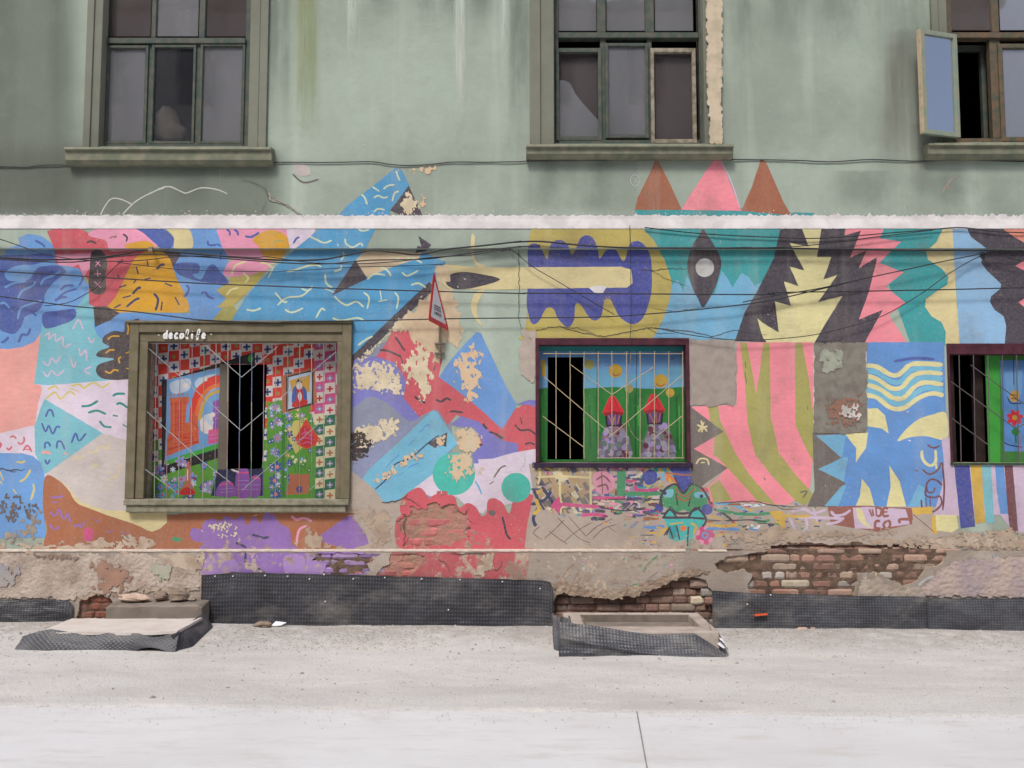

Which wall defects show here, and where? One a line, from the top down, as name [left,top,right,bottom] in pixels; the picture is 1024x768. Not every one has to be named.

peeling [706,0,723,144]
peeling [400,189,427,216]
peeling [819,347,843,374]
peeling [839,403,862,420]
peeling [351,417,399,464]
spalling [303,427,484,577]
peeling [208,521,237,538]
flaking render [0,493,205,619]
peeling [474,552,495,577]
spalling [553,525,1024,626]